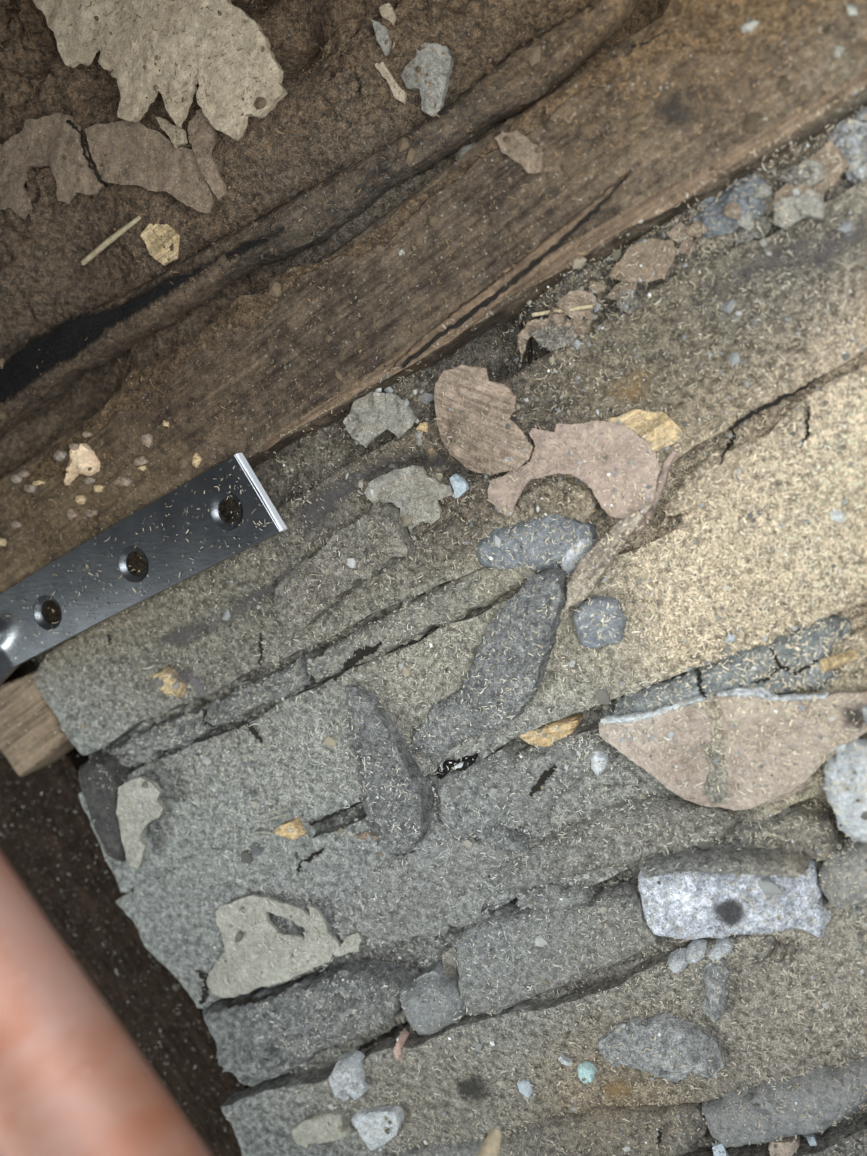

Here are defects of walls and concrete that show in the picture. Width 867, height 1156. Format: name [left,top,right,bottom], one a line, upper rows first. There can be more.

flaking render [343,391,417,448]
flaking render [605,409,683,451]
crack [720,373,826,464]
flaking render [363,465,469,533]
crack [333,641,382,681]
crack [750,647,819,684]
crack [529,766,557,797]
flaking render [116,776,166,869]
crack [296,802,362,872]
flaking render [206,893,363,998]
crack [196,968,323,1009]
flaking render [291,1106,405,1150]